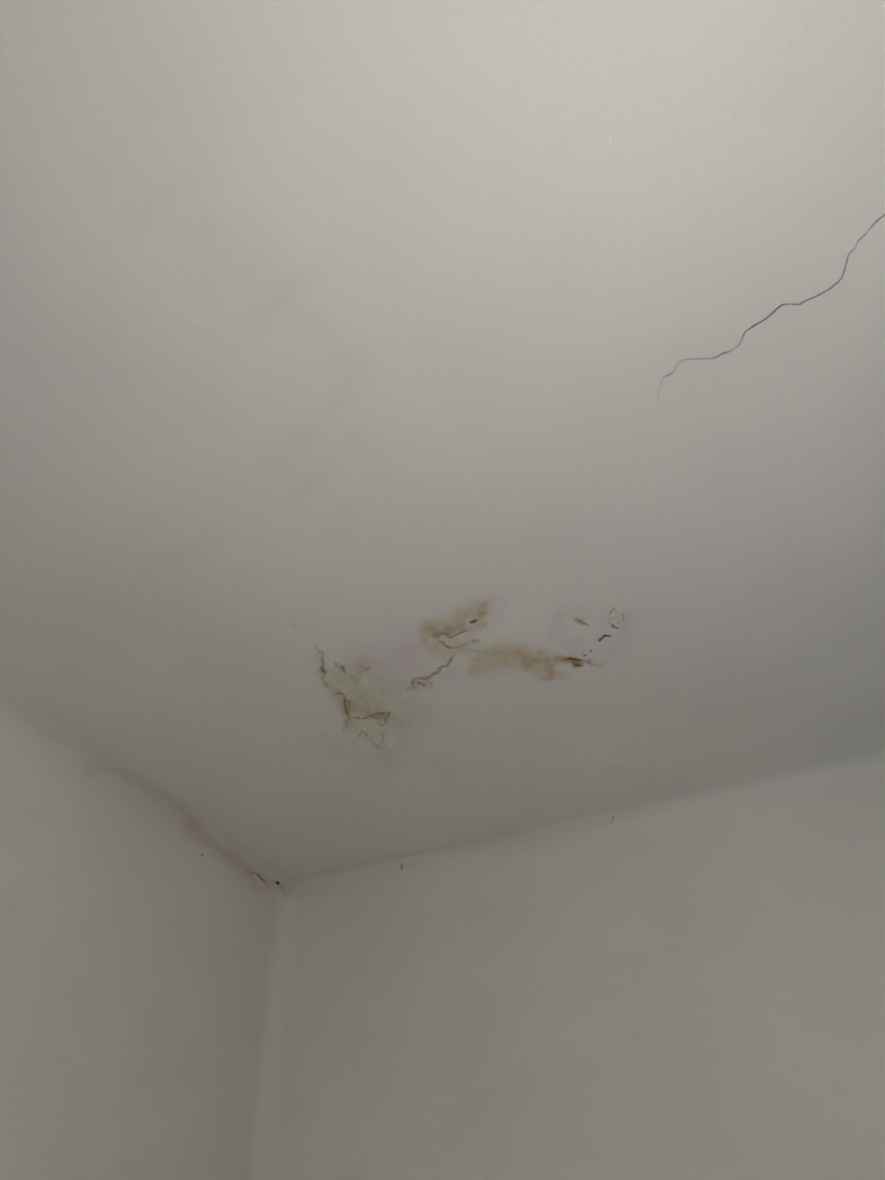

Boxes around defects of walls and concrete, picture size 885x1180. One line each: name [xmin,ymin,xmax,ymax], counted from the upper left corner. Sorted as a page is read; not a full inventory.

crack [715,280,840,358]